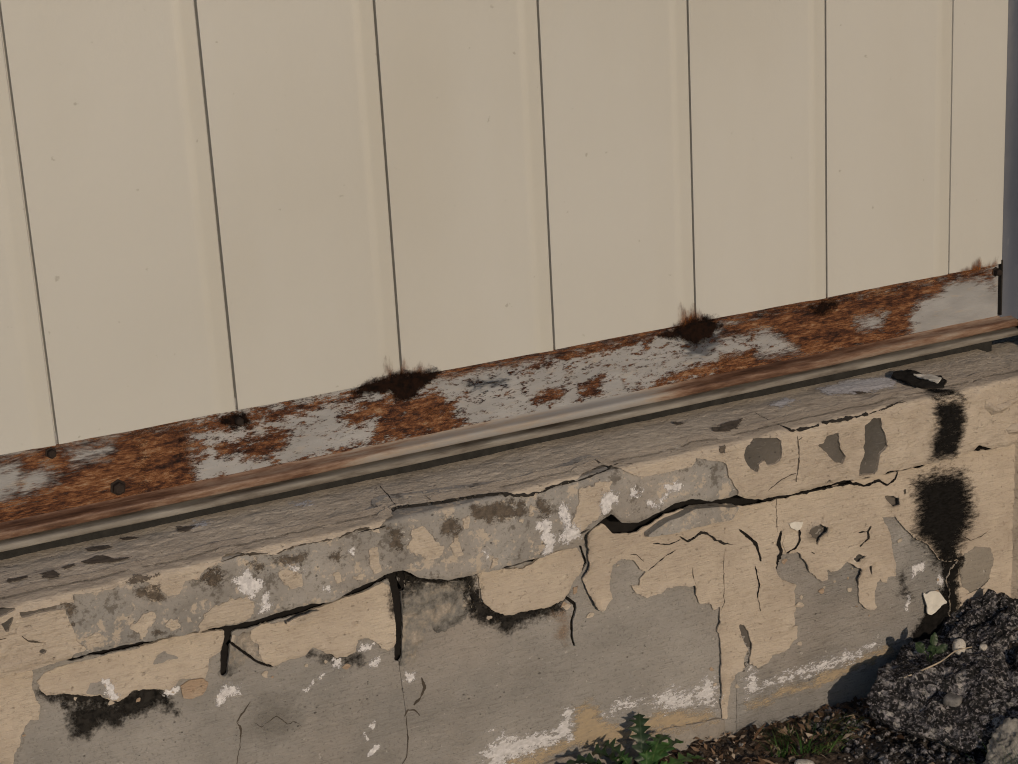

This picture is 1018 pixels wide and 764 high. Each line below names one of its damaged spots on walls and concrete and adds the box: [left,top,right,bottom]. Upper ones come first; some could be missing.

rust [0,260,996,523]
peeling [744,438,780,471]
peeling [818,433,844,463]
peeling [859,418,886,474]
crack [221,463,631,562]
crack [631,400,905,611]
crack [385,570,406,656]
peeling [0,445,947,764]
damp [389,571,564,634]
damp [38,686,180,739]
damp [474,675,724,764]
damp [740,636,895,707]